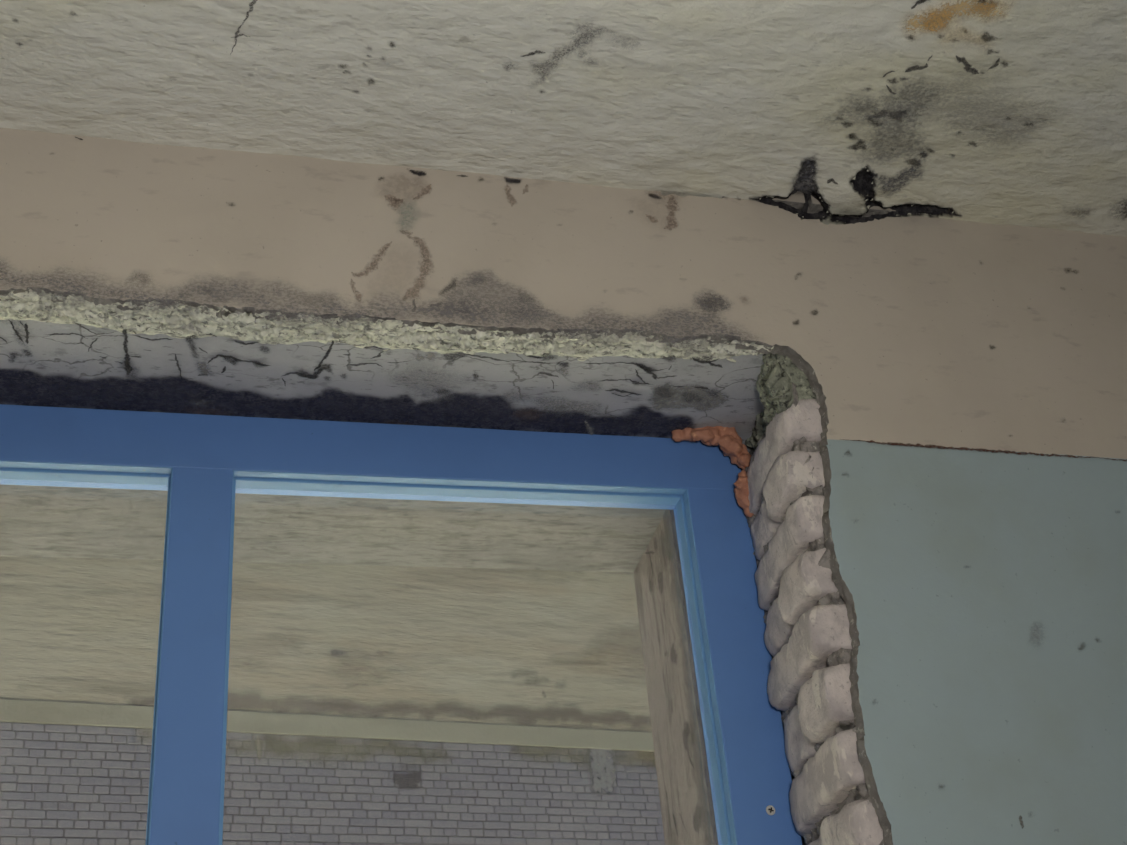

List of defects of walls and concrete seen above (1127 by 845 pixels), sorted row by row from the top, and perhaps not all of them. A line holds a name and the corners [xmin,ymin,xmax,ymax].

crack [230,0,256,55]
crack [749,157,961,224]
crack [0,311,407,384]
crack [577,357,723,397]
flaking render [0,288,884,845]